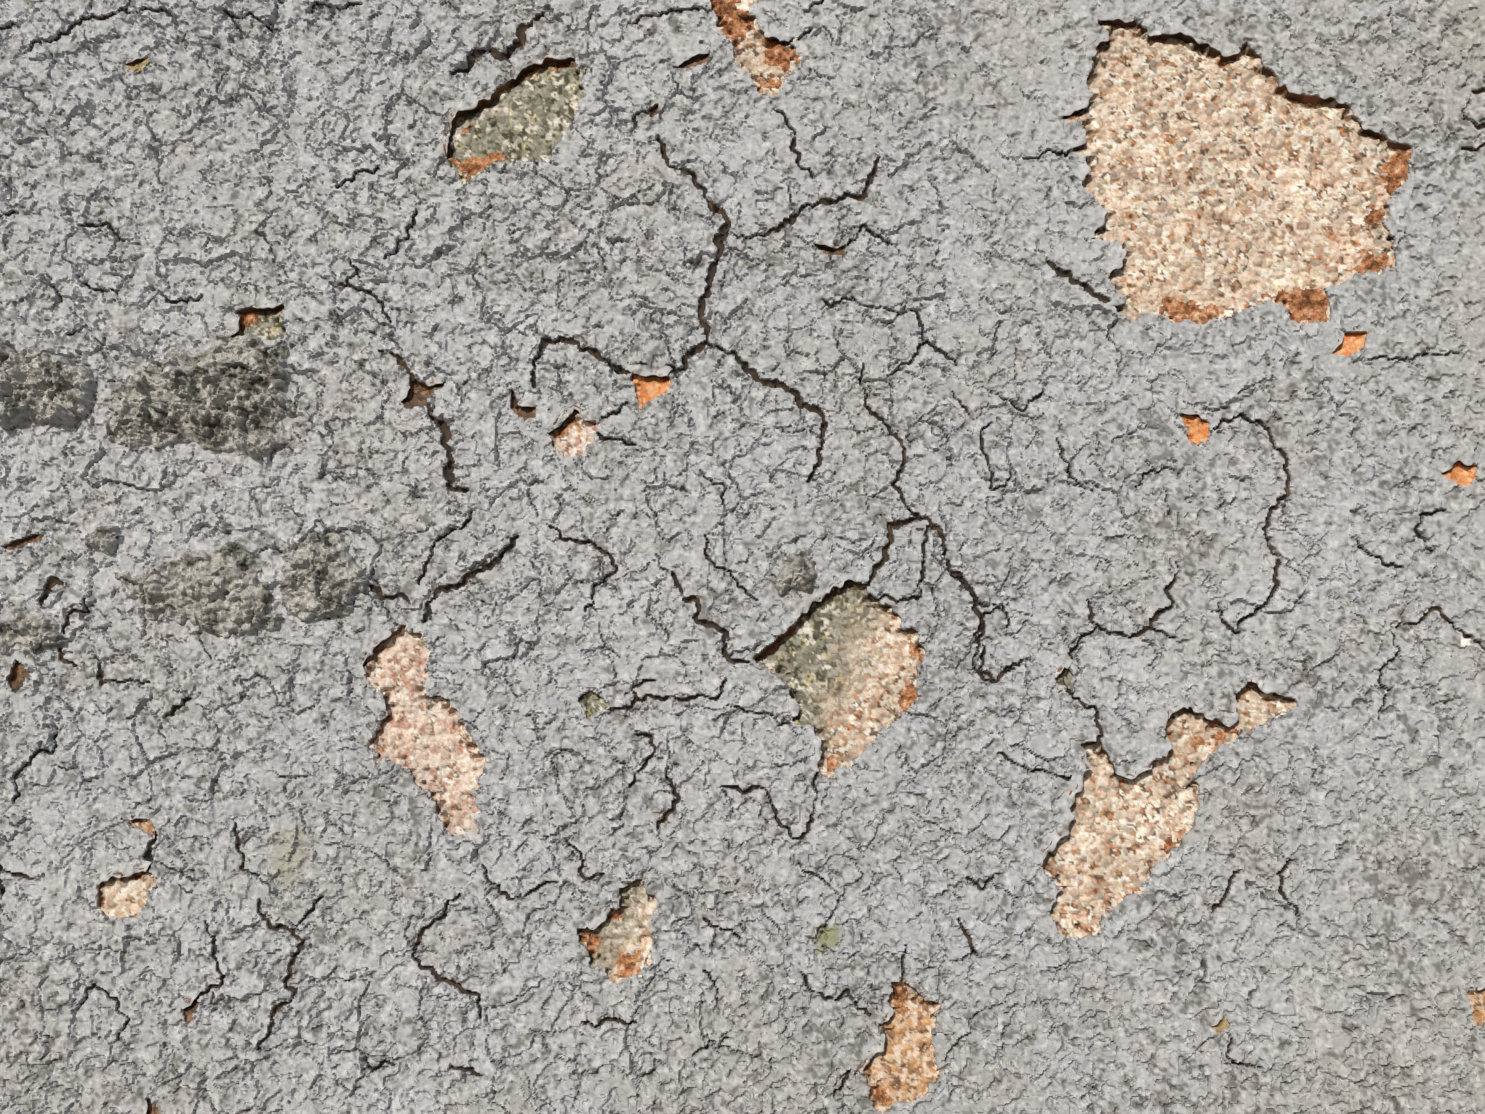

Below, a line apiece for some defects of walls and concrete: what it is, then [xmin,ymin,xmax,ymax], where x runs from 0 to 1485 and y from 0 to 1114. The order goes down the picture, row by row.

peeling [354,627,486,837]
crack [328,210,618,623]
peeling [436,47,587,184]
crack [607,536,790,829]
crack [531,111,892,482]
peeling [669,0,803,96]
peeling [755,569,925,780]
crack [824,297,1044,683]
crack [1061,565,1179,747]
peeling [1032,672,1297,939]
peeling [1061,10,1412,356]
crack [1213,414,1290,635]